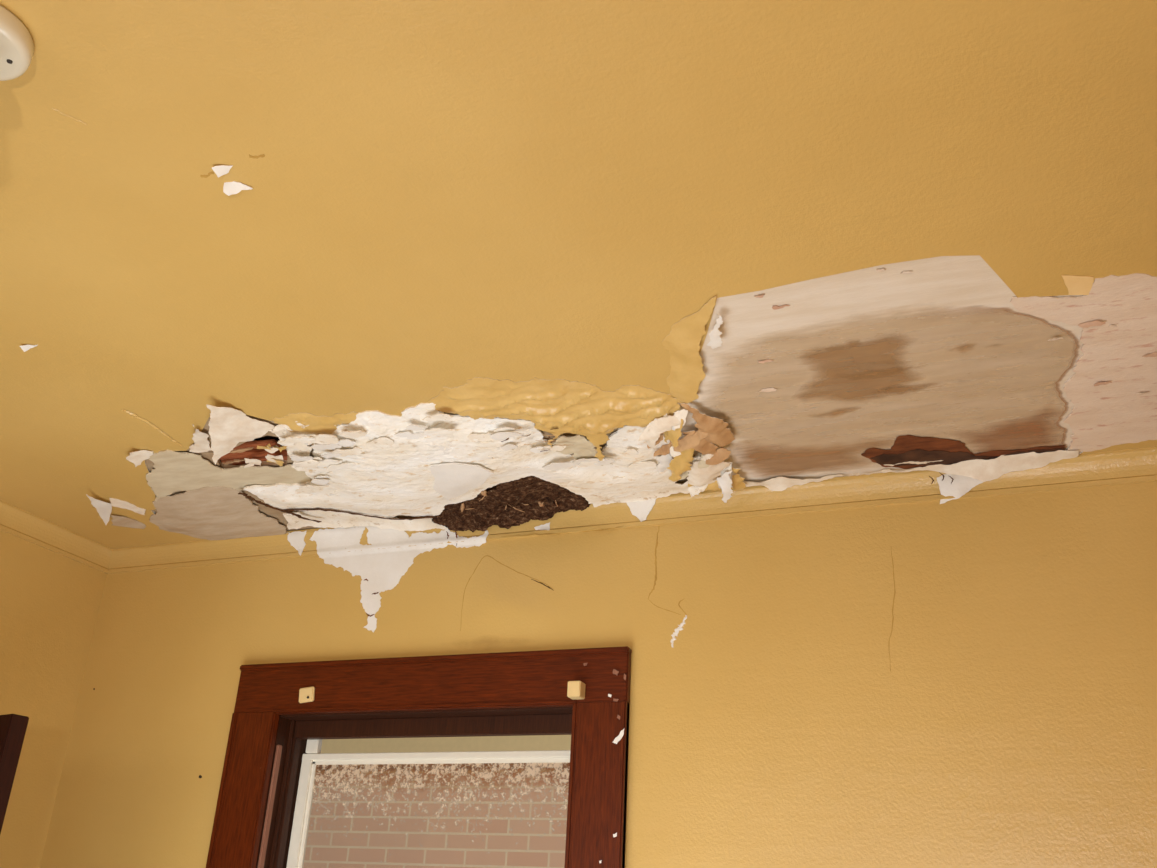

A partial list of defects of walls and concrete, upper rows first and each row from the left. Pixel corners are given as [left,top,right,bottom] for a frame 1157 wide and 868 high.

peeling [200,165,253,196]
damp [805,340,918,427]
flaking render [673,255,1157,504]
damp [917,309,1078,448]
spalling [524,428,618,466]
flaking render [86,404,489,633]
peeling [627,499,656,522]
crack [648,527,687,648]